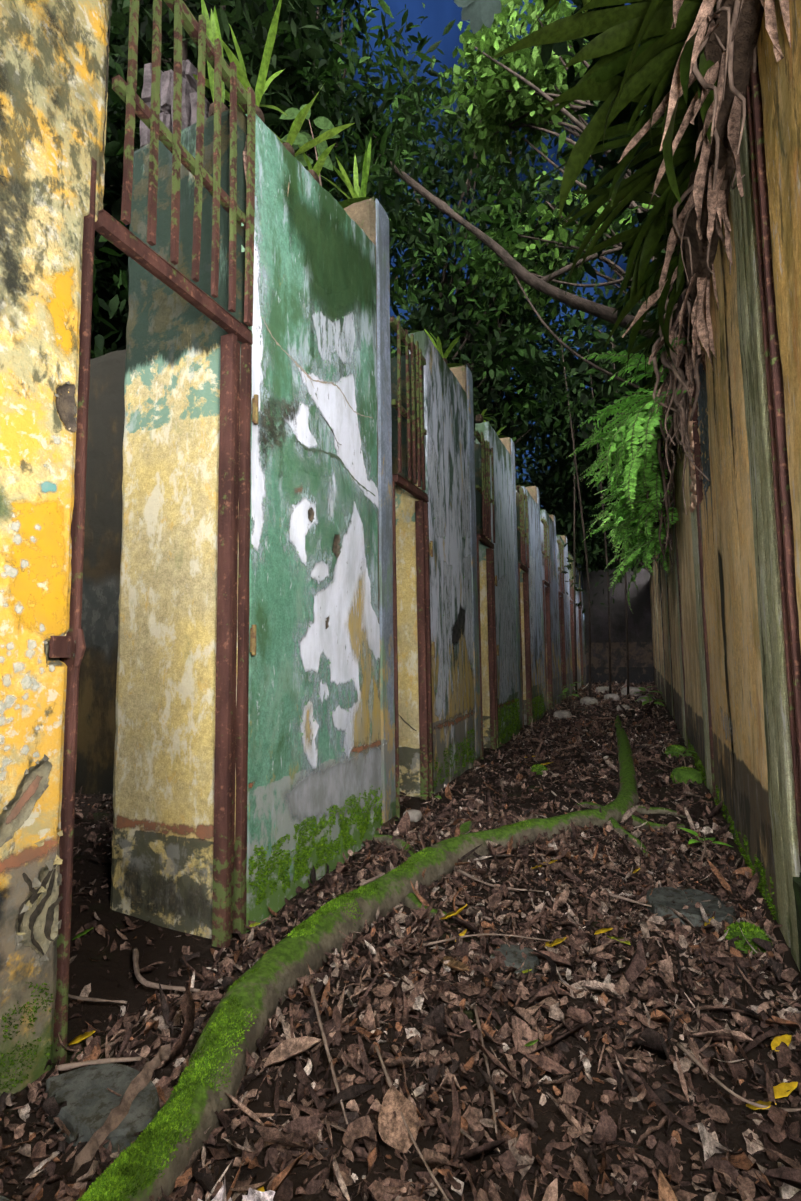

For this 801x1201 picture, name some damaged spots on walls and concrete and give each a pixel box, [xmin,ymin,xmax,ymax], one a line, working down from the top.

damp [42,5,66,40]
damp [0,178,31,293]
peeling [241,197,387,820]
damp [81,577,120,663]
peeling [0,754,63,962]